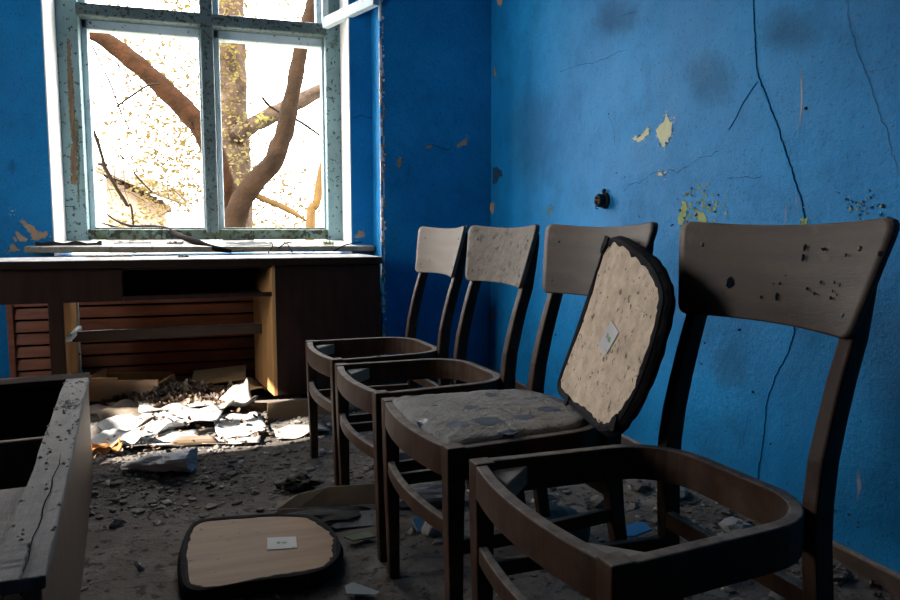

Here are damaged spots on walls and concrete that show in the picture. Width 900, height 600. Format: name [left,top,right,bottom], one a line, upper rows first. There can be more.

peeling [632,111,675,151]
crack [628,0,805,225]
crack [847,13,900,175]
peeling [671,182,727,226]
peeling [838,189,888,220]
peeling [7,210,51,254]
crack [742,327,795,479]